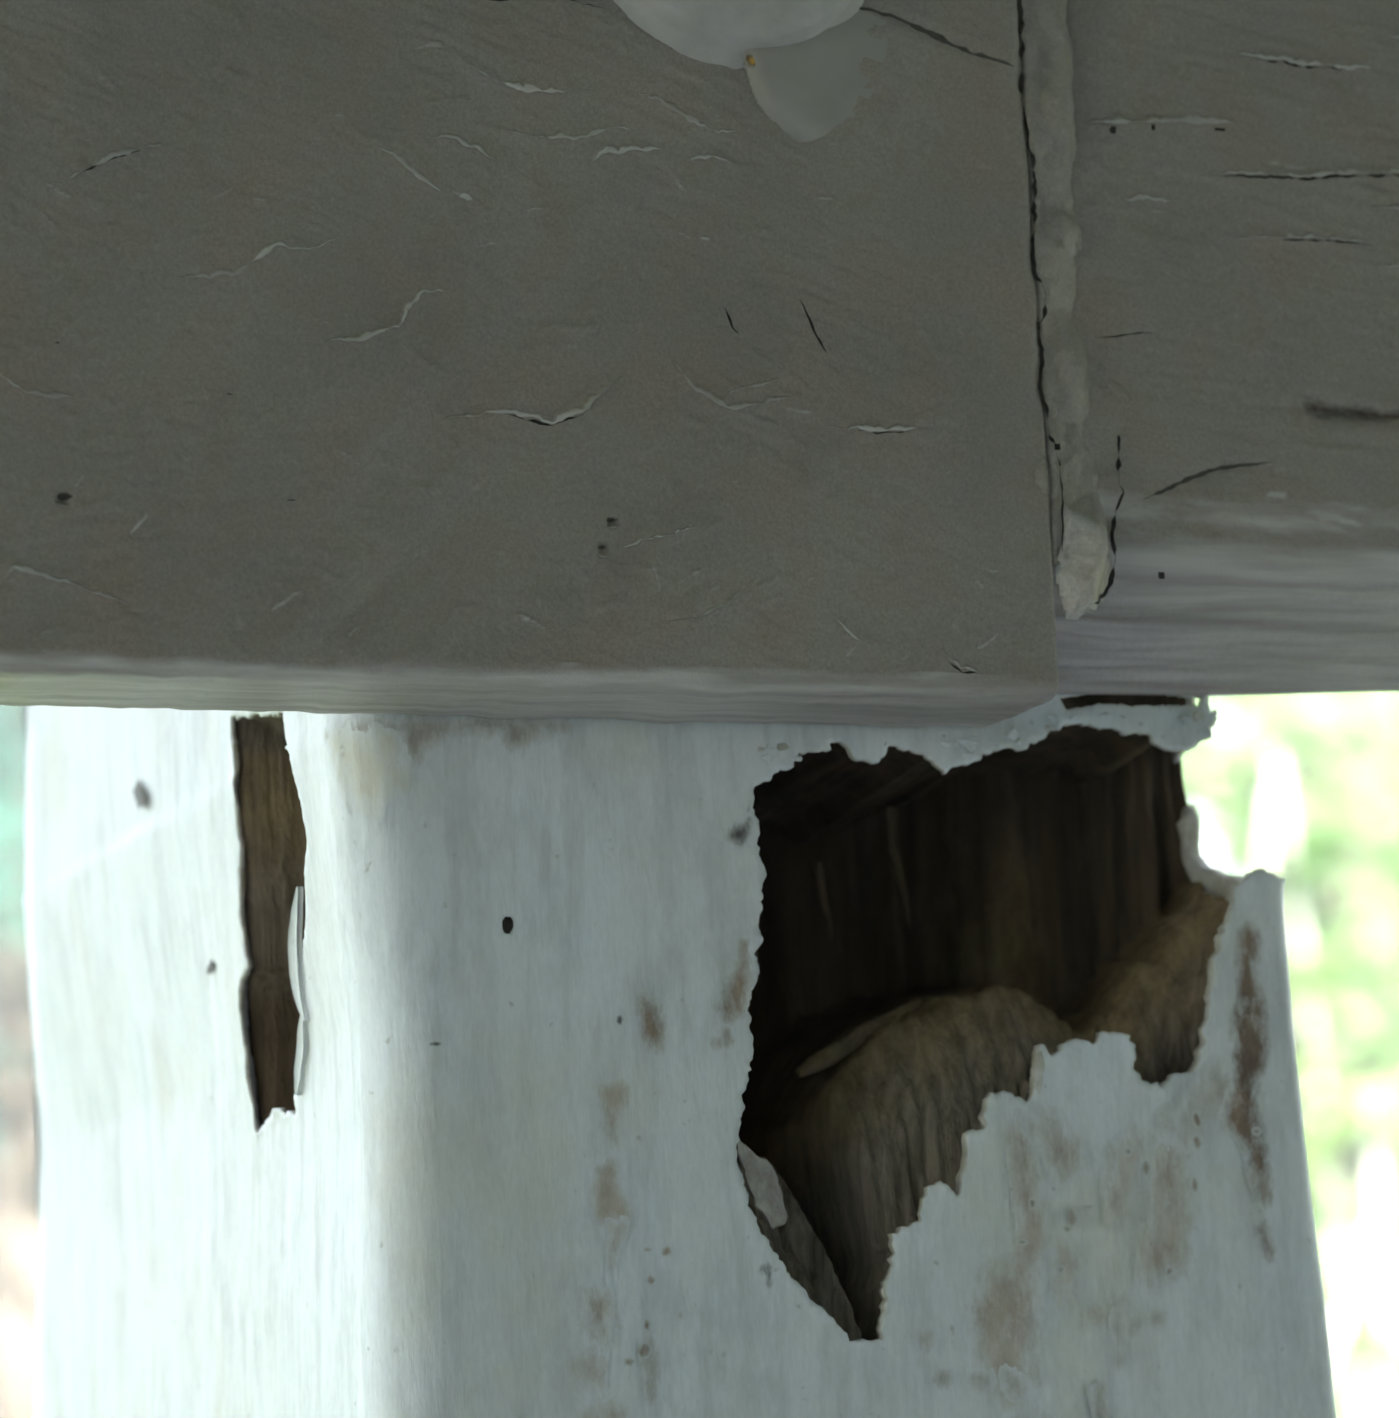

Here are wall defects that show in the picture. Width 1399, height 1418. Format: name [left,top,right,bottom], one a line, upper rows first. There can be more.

crack [1308,404,1399,418]
crack [1091,435,1273,605]
peeling [736,1140,787,1230]
damp [914,1051,1231,1418]